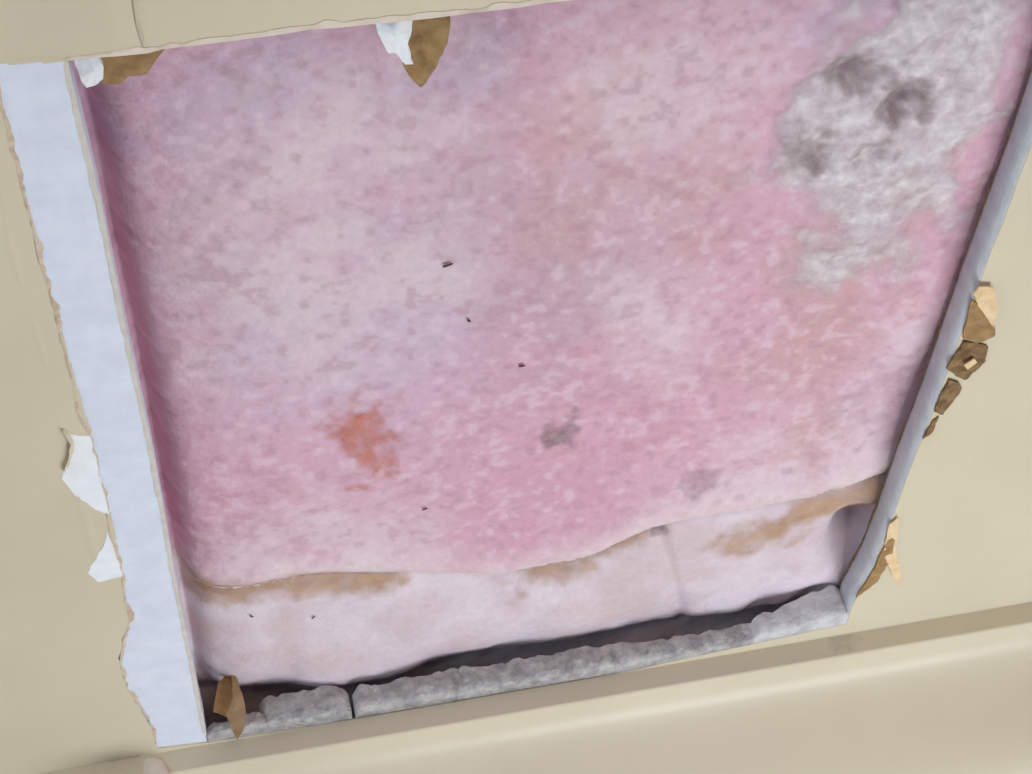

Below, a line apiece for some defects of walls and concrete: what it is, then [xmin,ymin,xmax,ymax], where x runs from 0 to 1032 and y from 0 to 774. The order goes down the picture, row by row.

peeling [0,61,849,743]